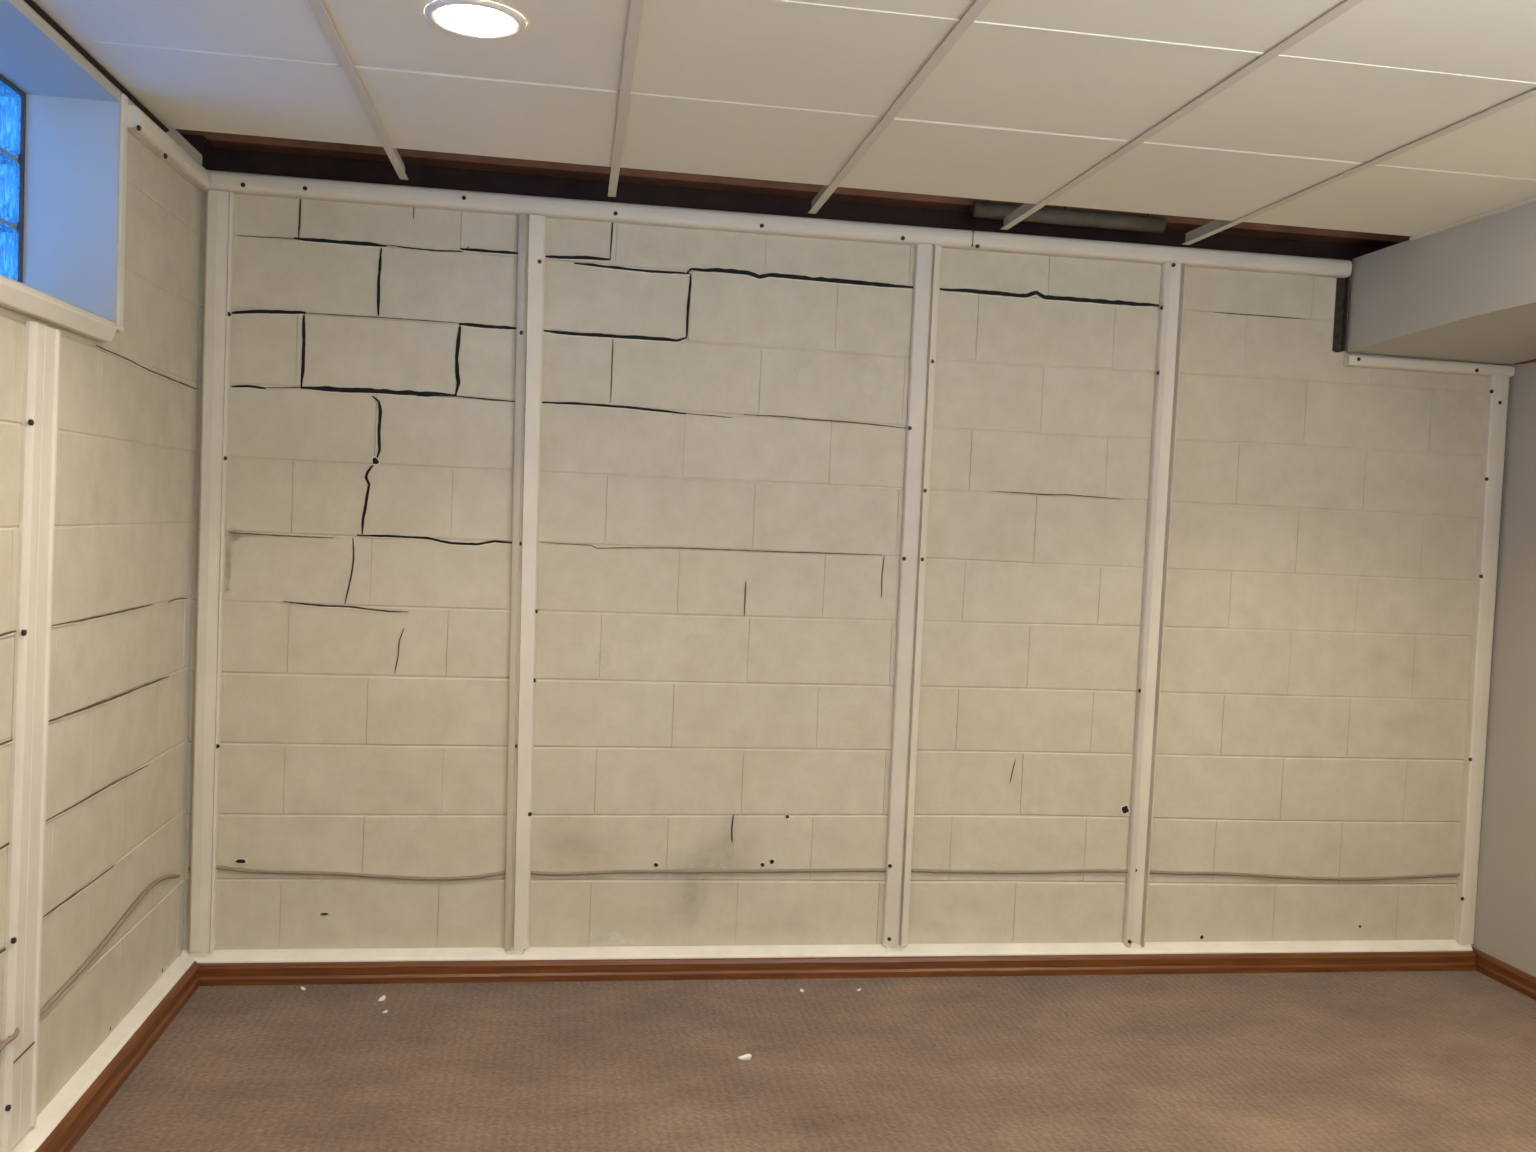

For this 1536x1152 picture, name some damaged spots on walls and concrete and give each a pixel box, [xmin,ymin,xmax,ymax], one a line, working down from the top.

crack [96,199,1159,673]
crack [0,598,189,638]
crack [49,676,169,723]
crack [46,765,149,823]
crack [43,865,115,919]